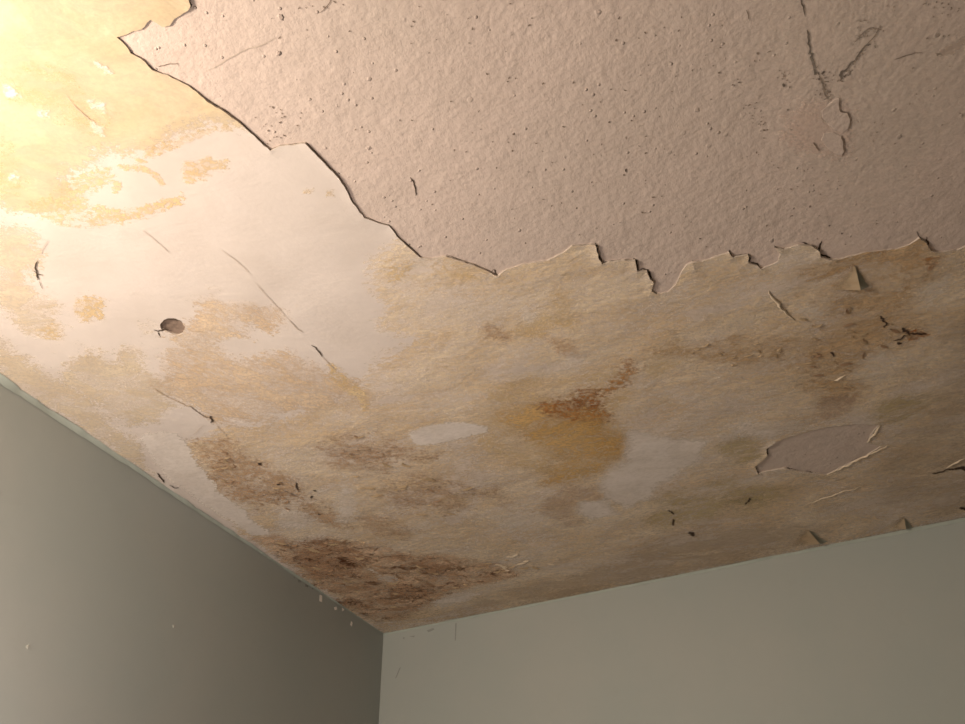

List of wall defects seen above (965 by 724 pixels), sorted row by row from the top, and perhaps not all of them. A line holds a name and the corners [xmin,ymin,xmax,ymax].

crack [800,0,879,102]
peeling [119,0,965,293]
spalling [155,318,185,337]
crack [224,252,336,371]
crack [880,316,926,345]
crack [153,388,227,437]
water stain [0,227,965,632]